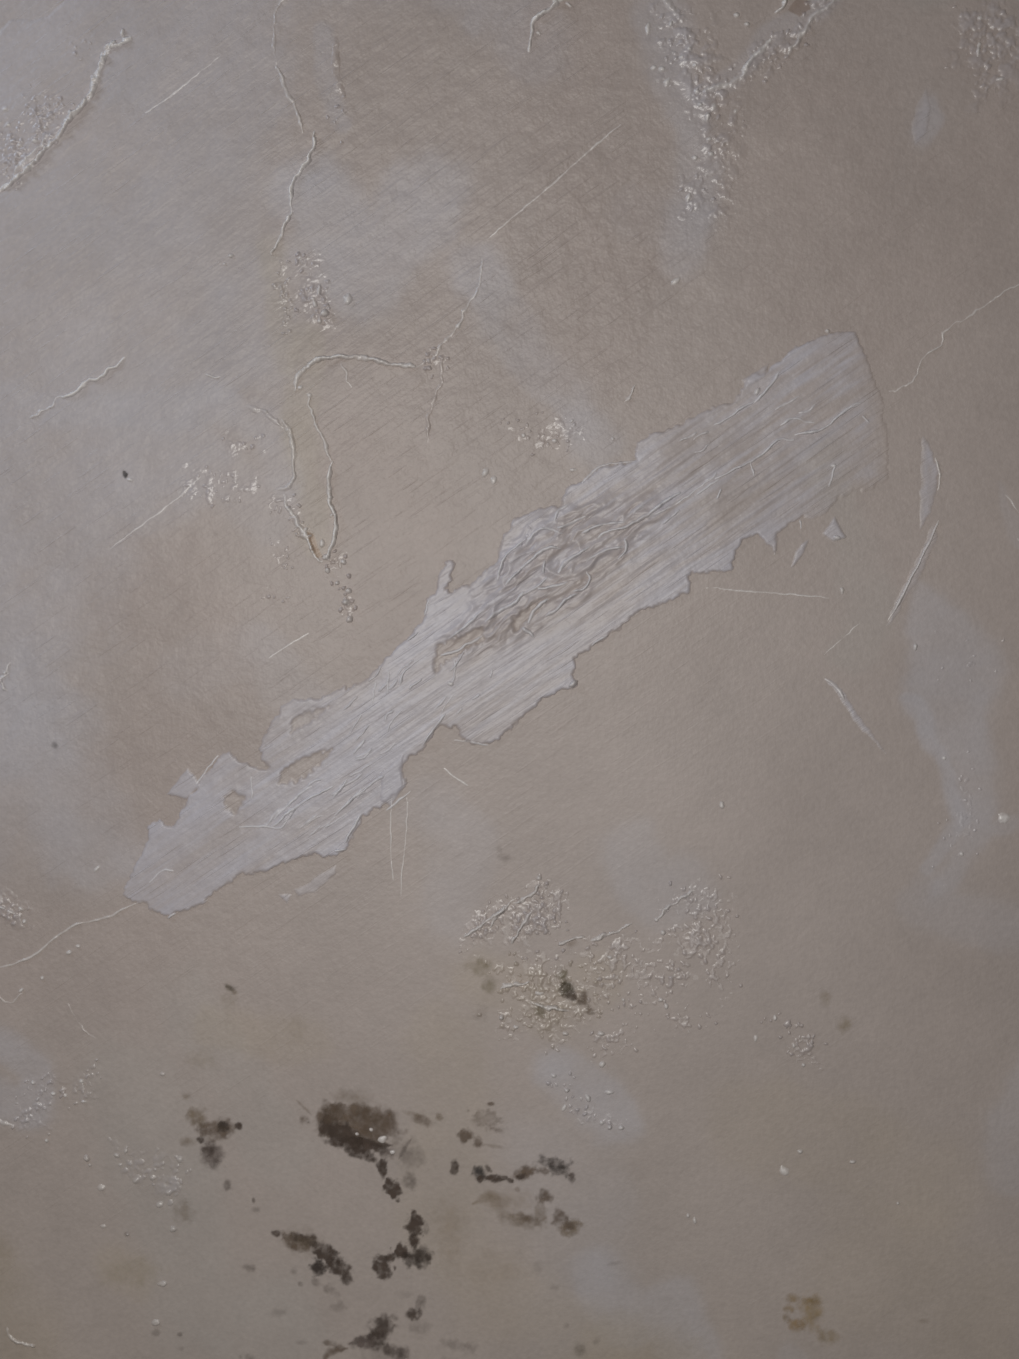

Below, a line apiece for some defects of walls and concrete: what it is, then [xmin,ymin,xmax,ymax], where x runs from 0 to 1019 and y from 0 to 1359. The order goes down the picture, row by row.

water stain [190,1111,242,1161]
water stain [317,1104,401,1202]
water stain [460,1130,481,1146]
water stain [475,1161,573,1183]
water stain [272,1231,351,1281]
water stain [372,1211,431,1279]
water stain [325,1318,391,1358]